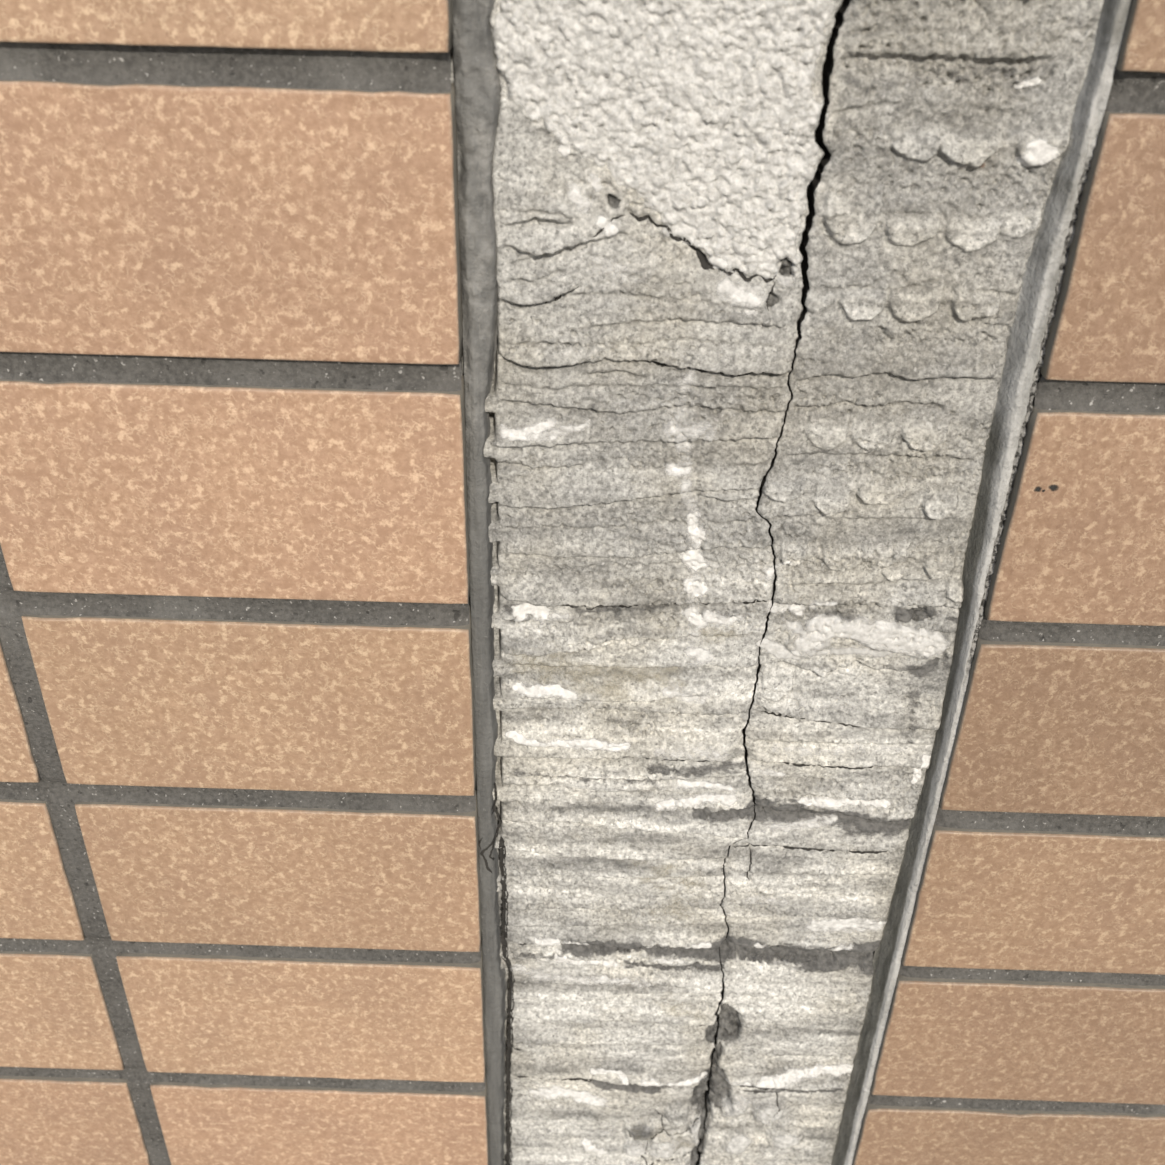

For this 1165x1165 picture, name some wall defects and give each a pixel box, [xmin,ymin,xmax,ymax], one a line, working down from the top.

crack [523,602,638,610]
crack [593,0,887,1165]
peeling [756,607,948,660]
spalling [690,1003,742,1165]